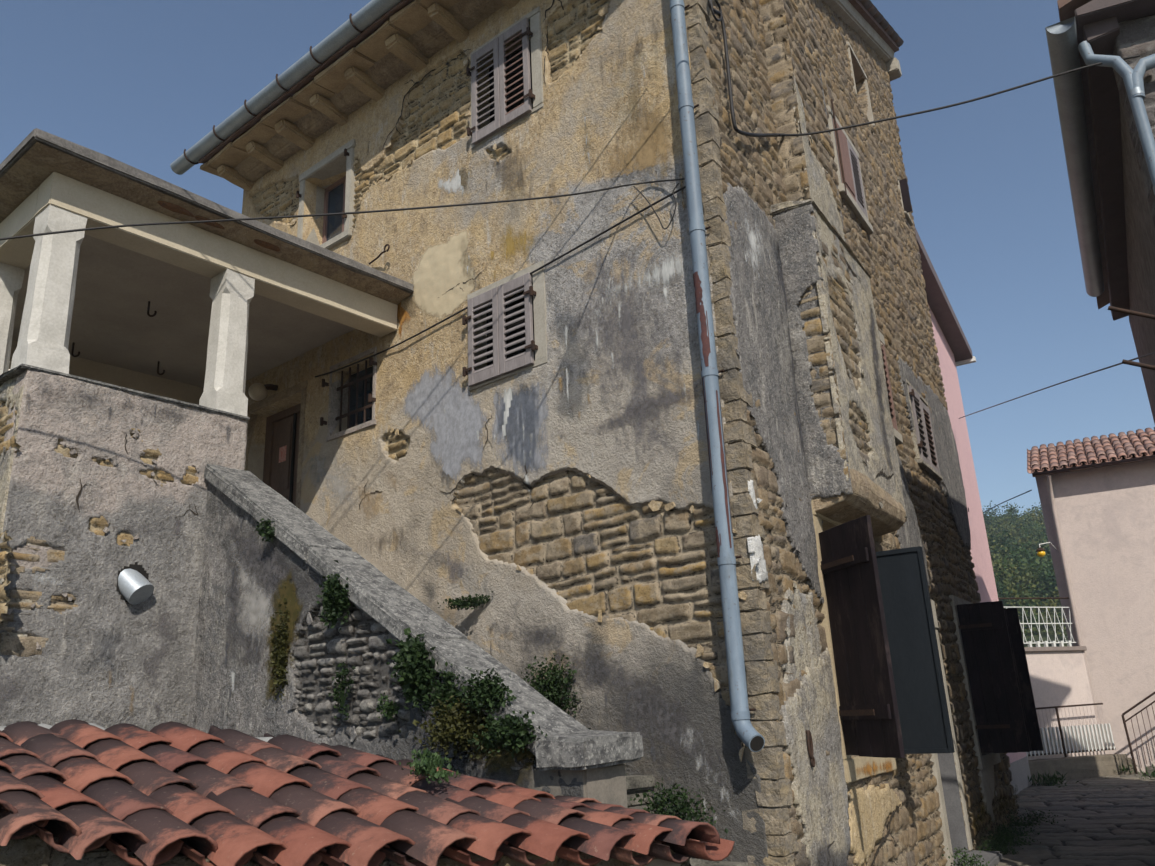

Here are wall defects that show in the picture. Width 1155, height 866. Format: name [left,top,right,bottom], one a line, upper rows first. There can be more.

spalling [547,0,611,83]
spalling [350,51,471,232]
spalling [0,397,22,456]
spalling [383,428,410,461]
water stain [494,387,512,439]
water stain [579,252,697,450]
spalling [0,531,78,657]
spalling [405,367,731,707]